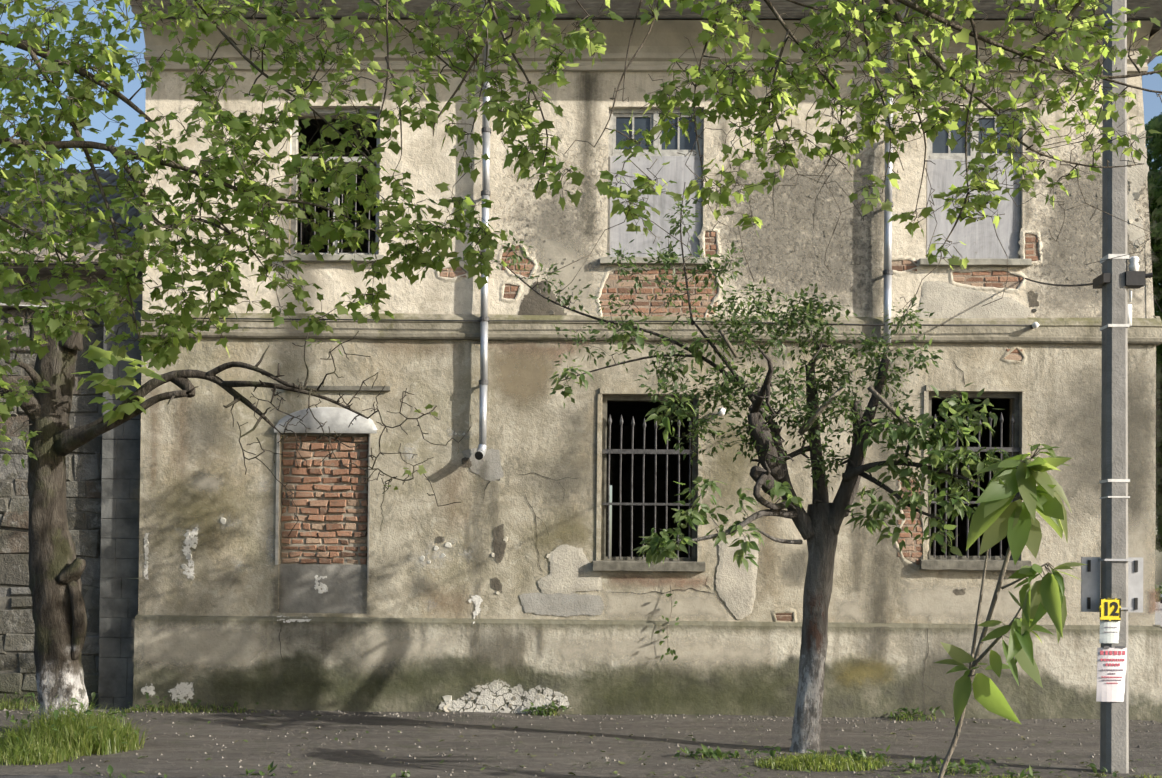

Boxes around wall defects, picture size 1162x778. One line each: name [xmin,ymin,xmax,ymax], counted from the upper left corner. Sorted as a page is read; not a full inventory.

water stain [581,75,597,236]
spalling [1014,159,1102,313]
peeling [181,527,198,580]
spalling [491,524,508,563]
peeling [468,595,483,624]
spalling [491,577,503,595]
crack [611,580,737,620]